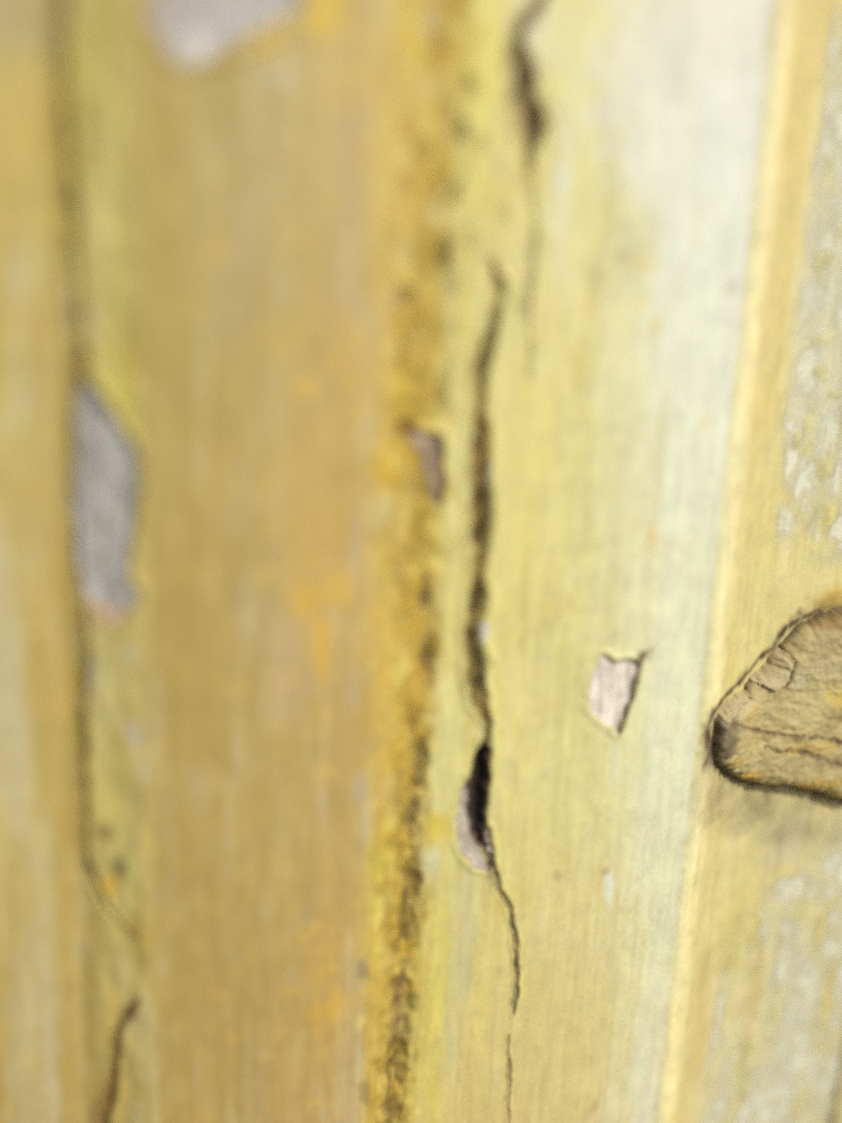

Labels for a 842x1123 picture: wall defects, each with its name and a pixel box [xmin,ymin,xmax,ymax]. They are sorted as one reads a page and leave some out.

peeling [71,350,143,627]
crack [466,0,547,1123]
peeling [588,651,647,735]
crack [99,998,140,1123]